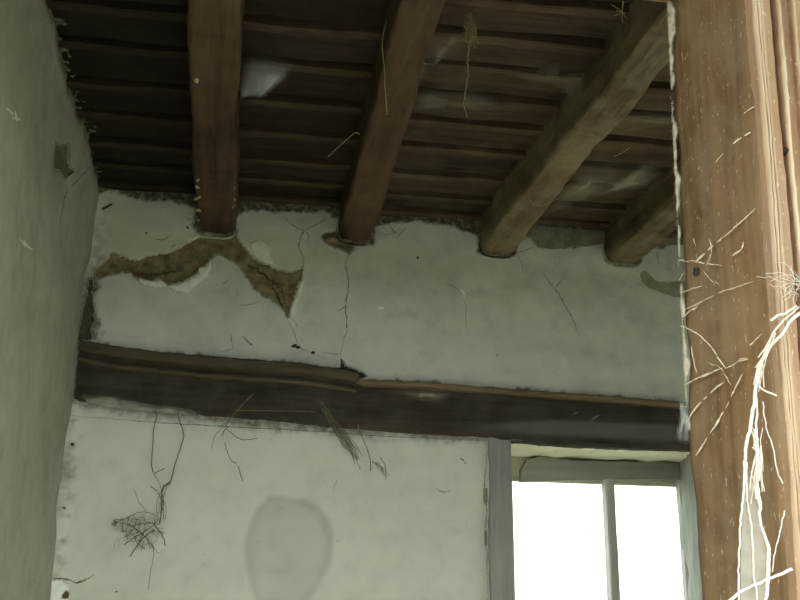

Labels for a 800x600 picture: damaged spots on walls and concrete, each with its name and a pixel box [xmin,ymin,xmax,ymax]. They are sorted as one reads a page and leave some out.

flaking render [53,142,75,180]
spalling [79,234,305,341]
crack [289,248,358,361]